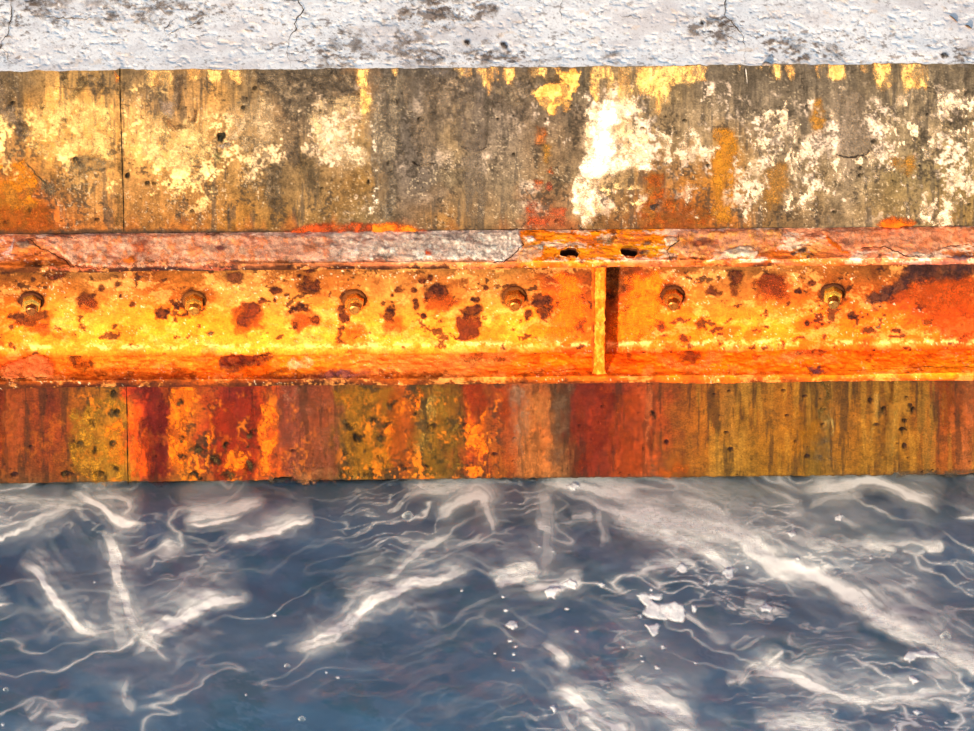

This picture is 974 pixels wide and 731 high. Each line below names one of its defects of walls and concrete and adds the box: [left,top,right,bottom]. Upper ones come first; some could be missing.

crack [0,6,12,63]
crack [286,0,308,67]
crack [724,0,746,68]
water stain [829,65,845,81]
water stain [874,64,927,89]
water stain [257,69,401,219]
water stain [428,65,705,223]
corrosion [0,159,566,344]
corrosion [639,128,783,296]
corrosion [822,217,974,339]
corrosion [219,354,273,377]
corrosion [127,387,339,481]